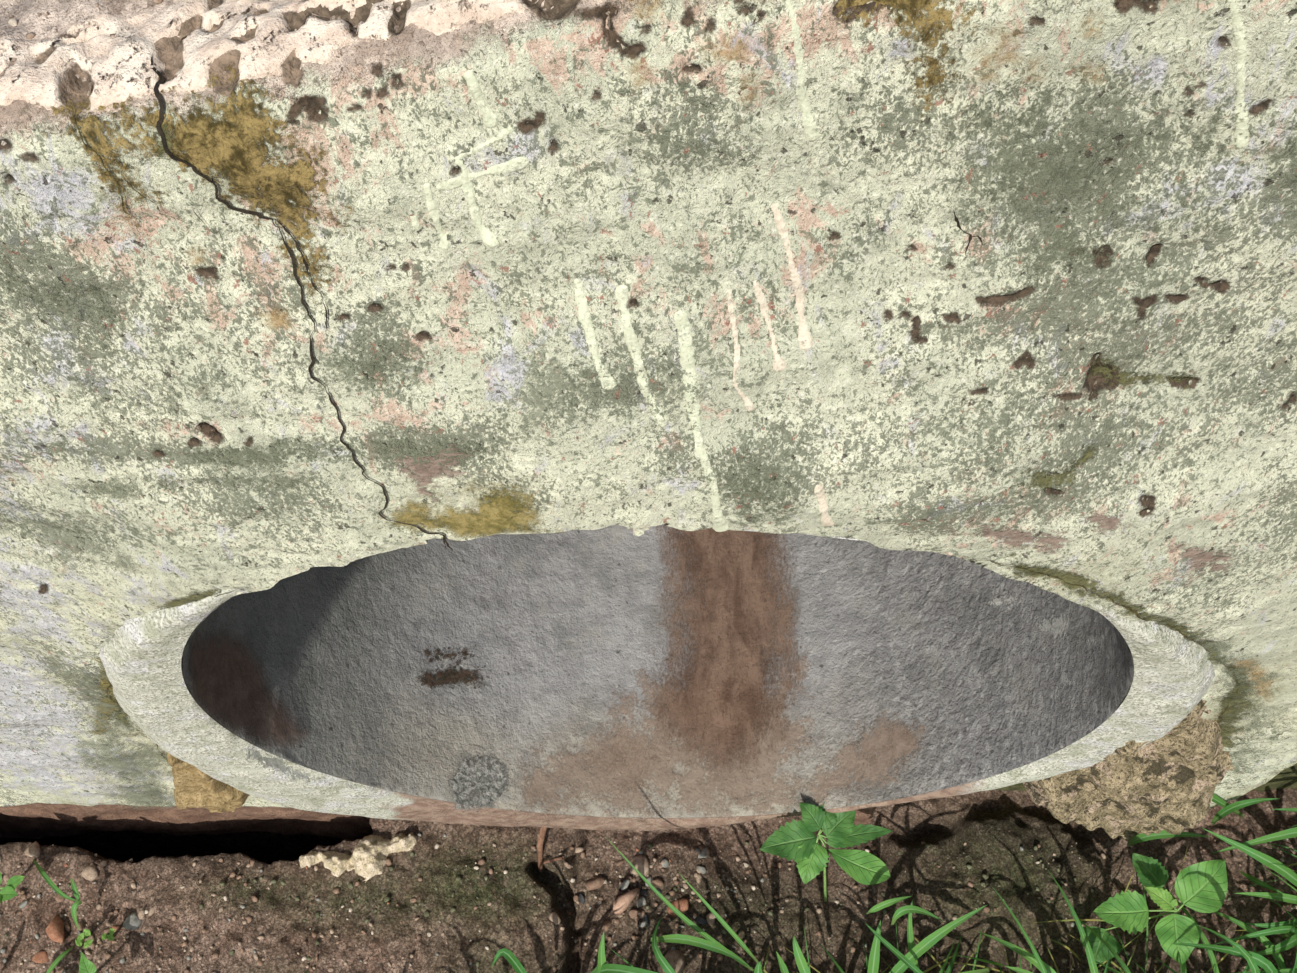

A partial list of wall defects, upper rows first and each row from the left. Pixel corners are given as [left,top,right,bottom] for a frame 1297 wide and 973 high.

crack [72,56,453,551]